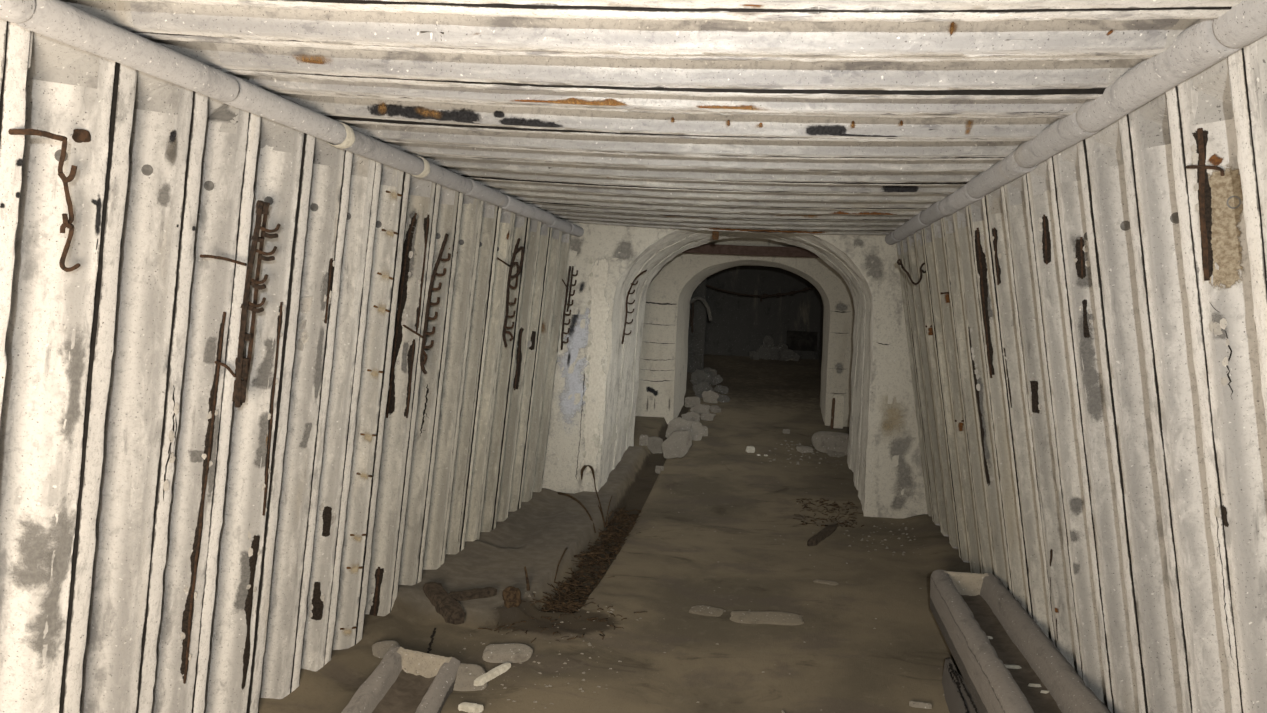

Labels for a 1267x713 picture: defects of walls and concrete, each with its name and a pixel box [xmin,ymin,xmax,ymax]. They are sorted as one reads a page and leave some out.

rust [515,98,626,106]
spalling [1186,128,1243,288]
water stain [62,338,85,436]
peeling [1209,303,1233,400]
water stain [891,437,911,509]
water stain [13,508,75,659]